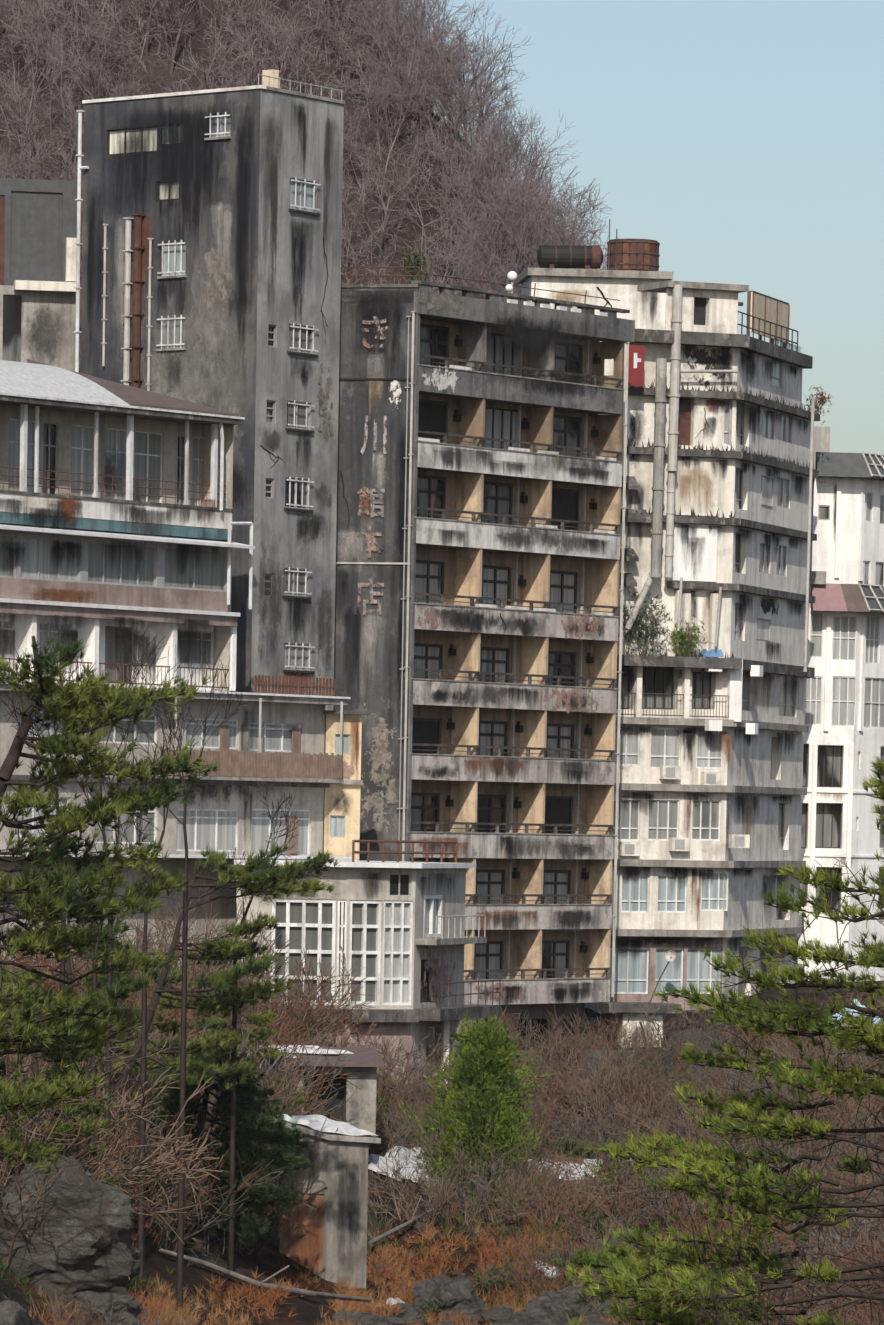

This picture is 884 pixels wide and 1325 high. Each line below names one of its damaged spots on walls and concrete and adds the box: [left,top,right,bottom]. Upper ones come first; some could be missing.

damp [124,113,209,199]
damp [298,105,306,155]
damp [325,122,333,185]
damp [88,204,125,300]
damp [216,123,281,312]
peeling [422,365,458,394]
damp [682,457,725,491]
spalling [342,698,399,835]